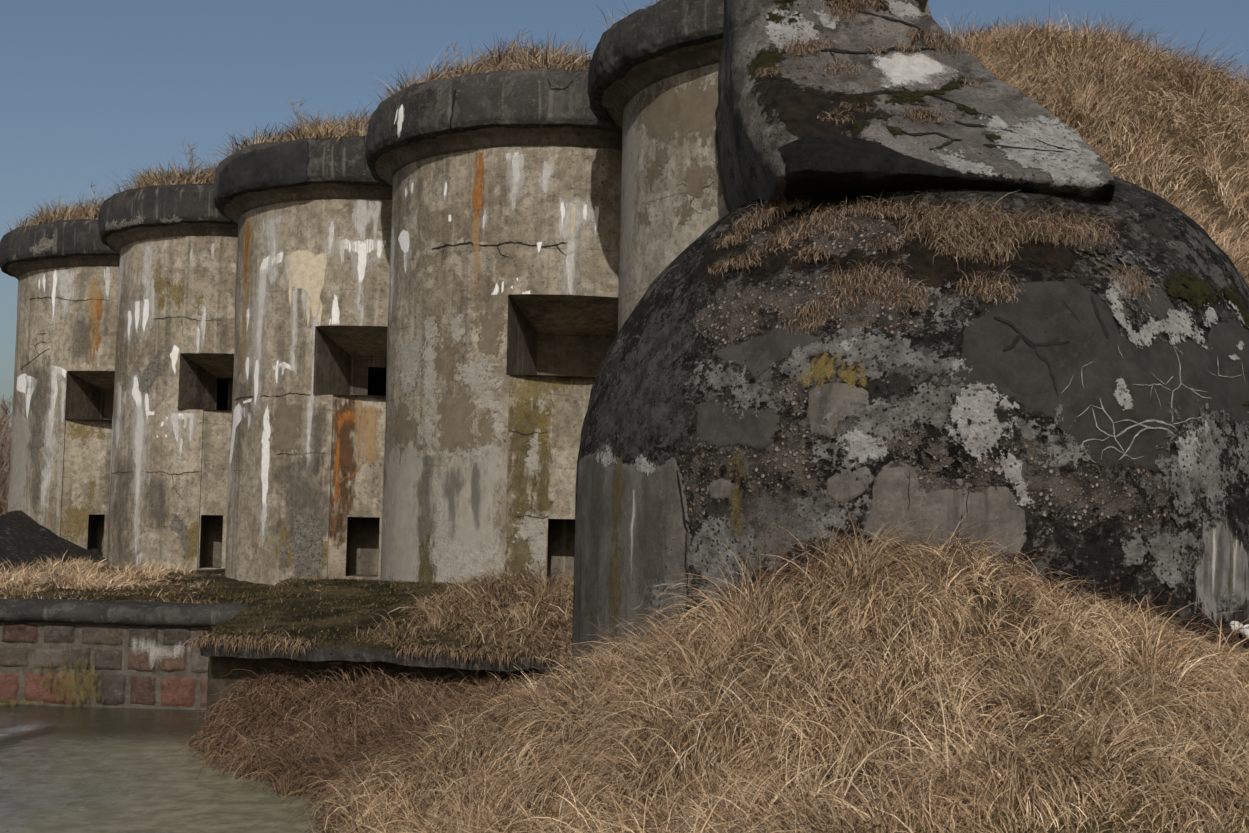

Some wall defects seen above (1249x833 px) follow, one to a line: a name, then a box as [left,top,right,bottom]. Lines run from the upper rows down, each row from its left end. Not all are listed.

crack [808,9,934,62]
crack [860,82,1070,152]
corrosion [472,152,486,280]
crack [431,241,579,257]
corrosion [89,280,102,368]
damp [227,199,410,536]
crack [994,295,1245,463]
damp [8,366,67,523]
corrosion [329,397,377,546]